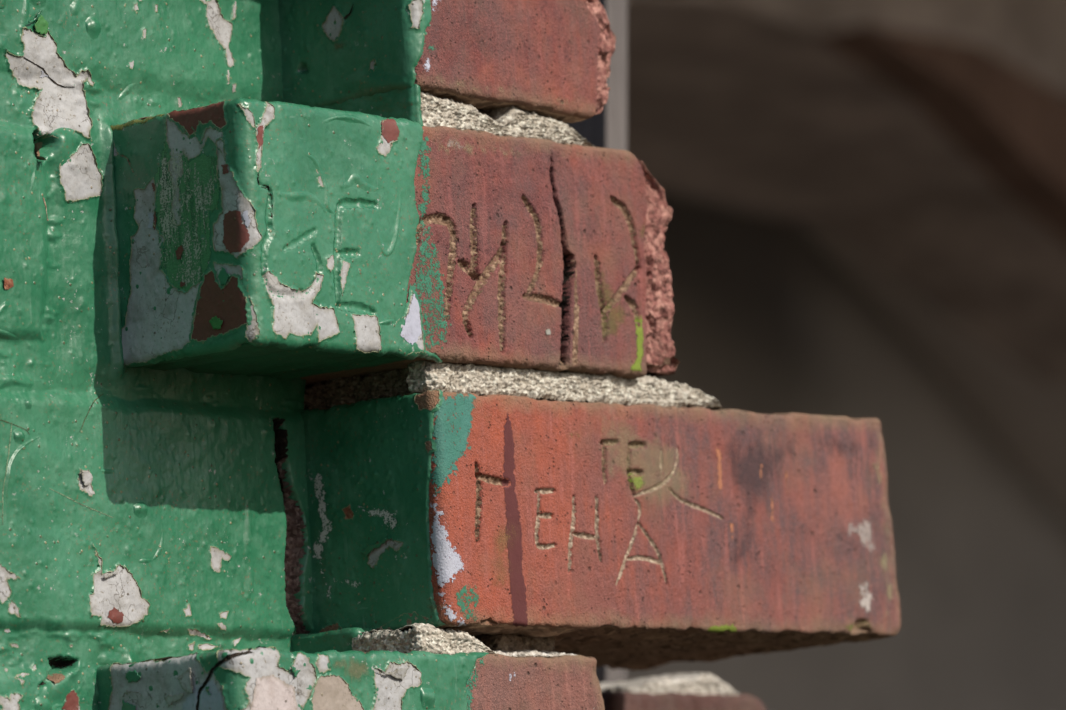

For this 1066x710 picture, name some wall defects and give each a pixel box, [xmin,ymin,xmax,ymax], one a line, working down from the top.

peeling [406,0,425,34]
peeling [3,10,105,205]
peeling [375,118,400,159]
peeling [121,0,383,368]
peeling [395,287,426,355]
peeling [0,561,24,651]
peeling [87,541,152,631]
crack [196,651,252,710]
peeling [106,601,423,710]